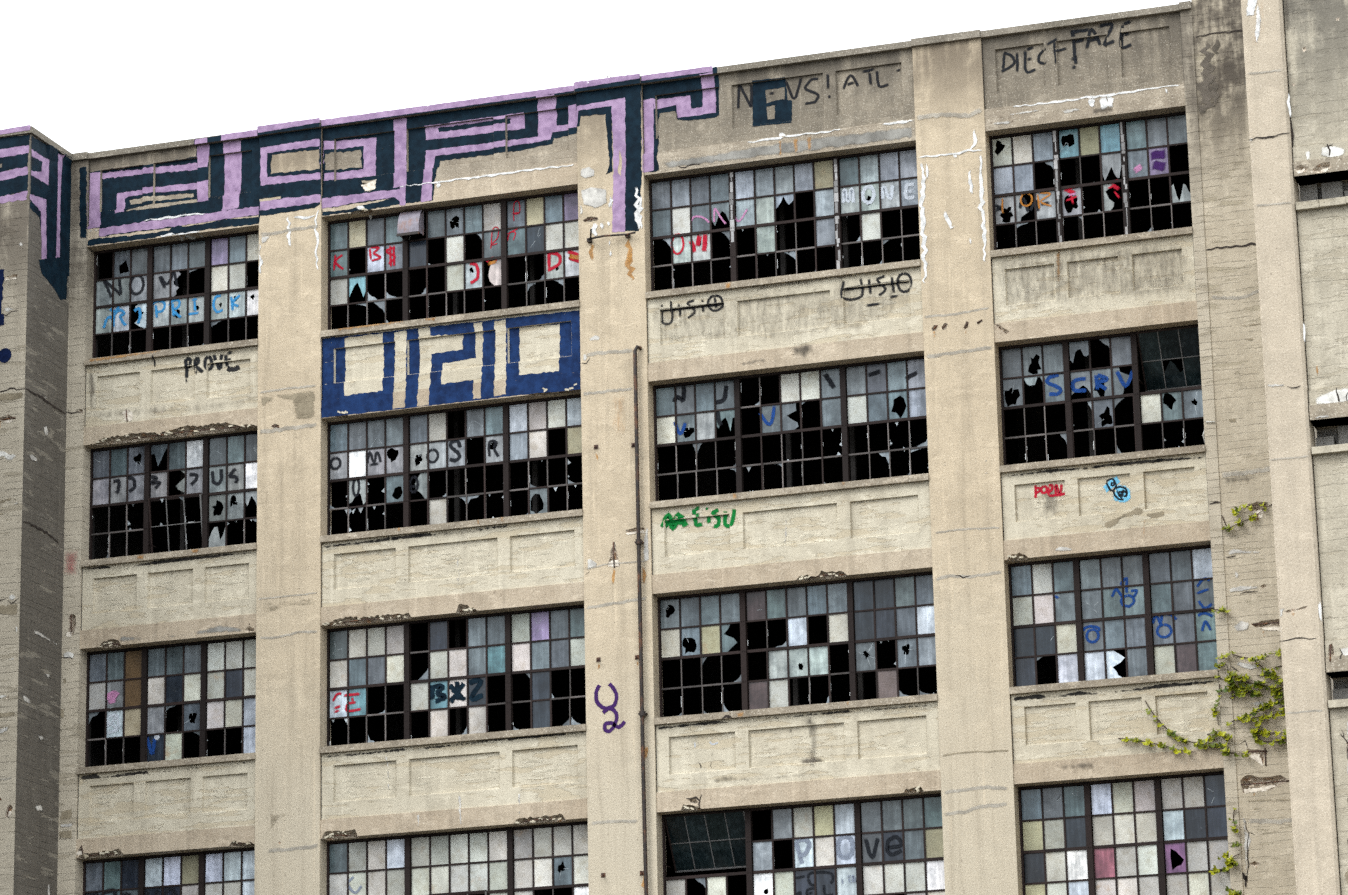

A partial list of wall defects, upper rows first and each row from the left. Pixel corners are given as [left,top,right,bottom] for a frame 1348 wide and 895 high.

spalling [1295,146,1344,174]
corrosion [625,240,635,279]
crack [1206,242,1256,250]
spalling [1252,606,1315,642]
peeling [0,696,30,733]
spalling [1240,741,1291,810]